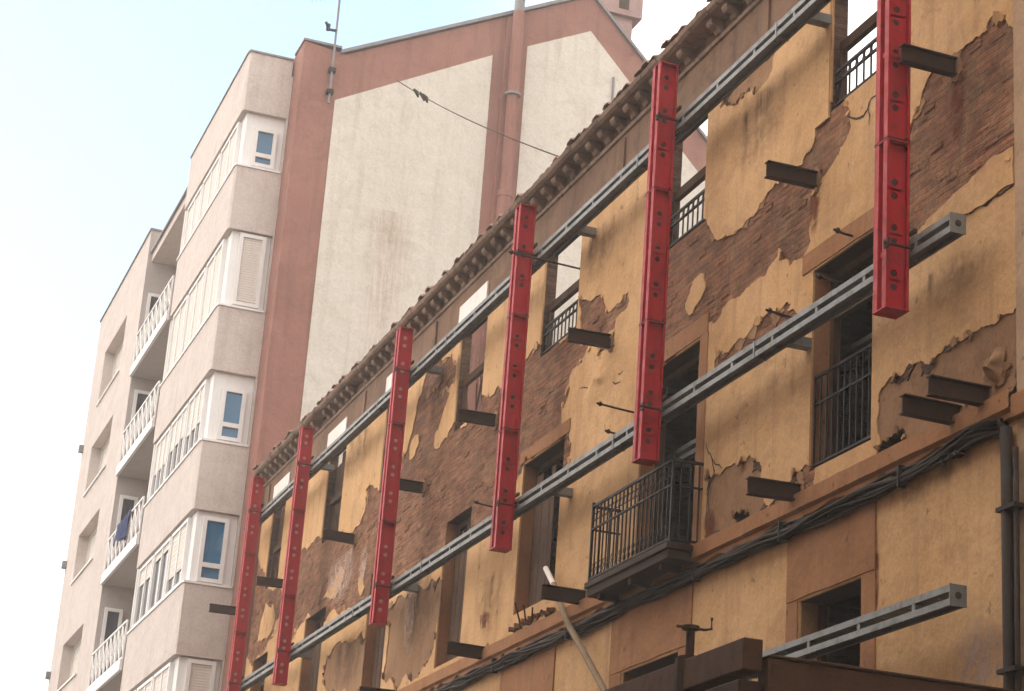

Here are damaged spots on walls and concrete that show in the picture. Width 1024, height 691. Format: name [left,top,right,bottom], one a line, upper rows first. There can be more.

spalling [909,11,1014,240]
spalling [665,99,851,342]
spalling [517,294,629,479]
spalling [715,302,797,367]
spalling [873,311,1017,453]
spalling [292,482,381,638]
spalling [381,578,442,689]
spalling [391,353,502,580]
spalling [704,456,780,538]
spalling [790,465,815,490]